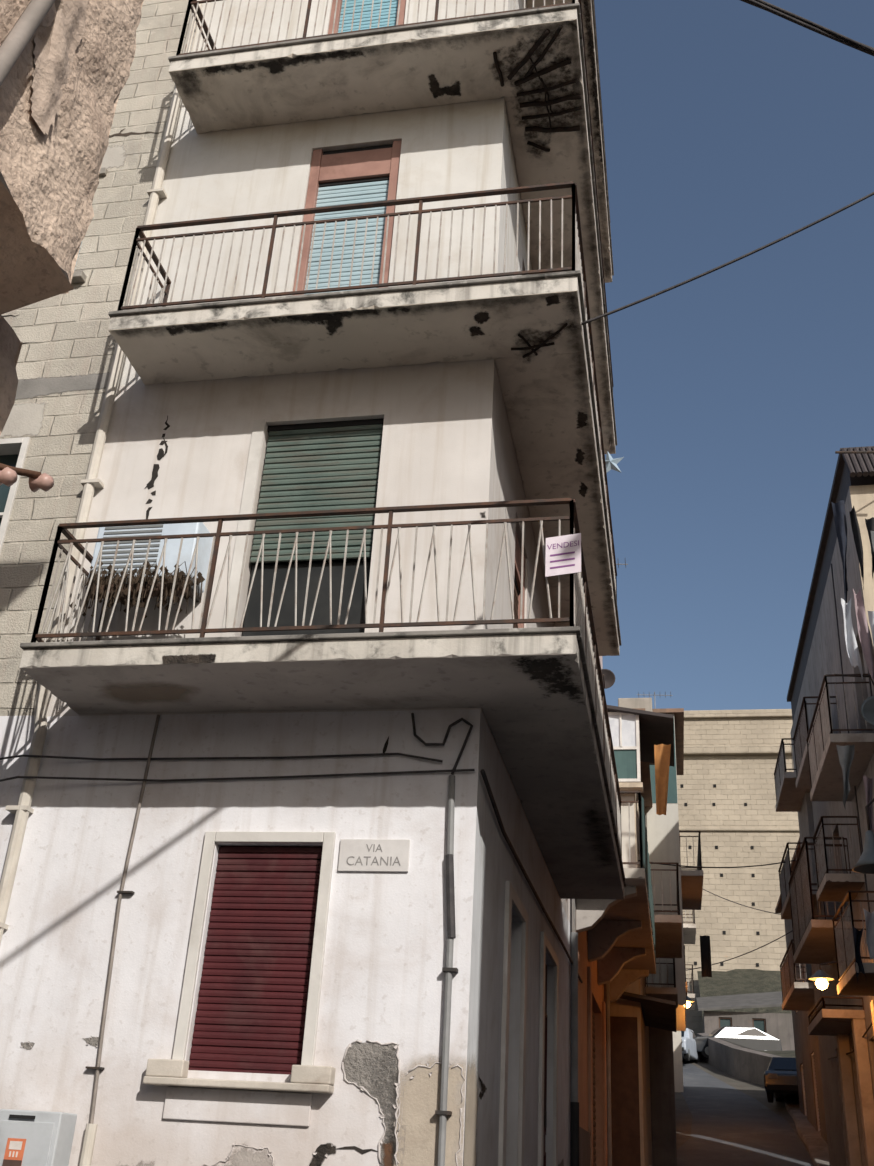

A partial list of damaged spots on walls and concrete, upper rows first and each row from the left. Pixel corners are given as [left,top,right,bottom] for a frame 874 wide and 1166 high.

water stain [177,47,376,94]
spalling [428,74,461,98]
spalling [492,25,582,155]
crack [109,129,163,137]
water stain [569,0,610,277]
spalling [511,323,576,361]
crack [144,416,170,519]
flaking render [342,1040,487,1166]
peeling [202,1143,274,1166]
crack [309,1143,378,1166]